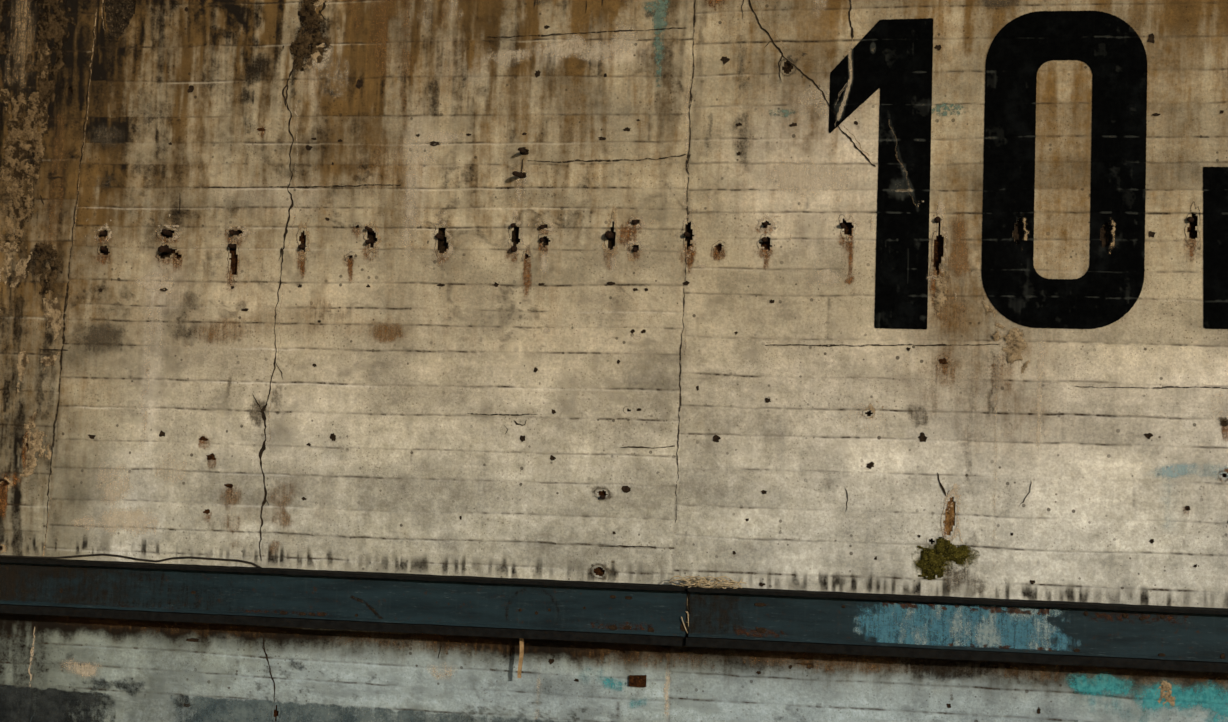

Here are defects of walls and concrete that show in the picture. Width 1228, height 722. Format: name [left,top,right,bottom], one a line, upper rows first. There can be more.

spalling [101,0,138,42]
water stain [240,4,270,104]
water stain [291,0,330,93]
water stain [498,31,634,62]
crack [741,0,917,207]
flaking render [0,0,76,393]
crack [208,1,400,560]
flaking render [0,411,52,509]
water stain [944,568,984,590]